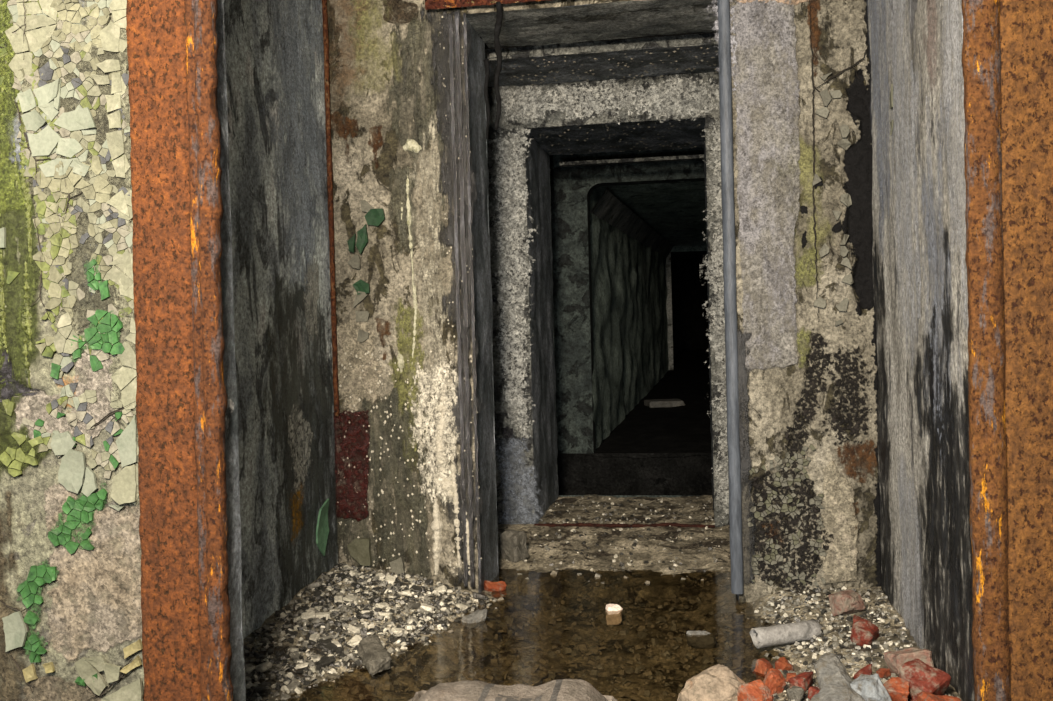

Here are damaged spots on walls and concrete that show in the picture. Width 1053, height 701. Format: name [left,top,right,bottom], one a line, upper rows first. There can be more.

water stain [10,115,26,173]
spalling [0,0,143,701]
water stain [863,0,941,606]
water stain [906,177,975,701]